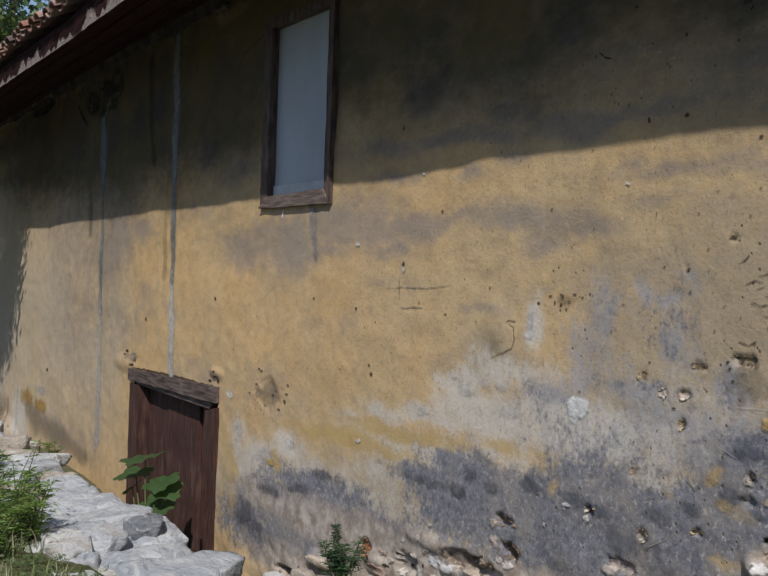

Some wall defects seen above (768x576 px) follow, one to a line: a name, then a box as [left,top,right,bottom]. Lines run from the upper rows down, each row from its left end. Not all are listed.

water stain [168,33,182,377]
water stain [94,96,112,447]
crack [738,273,768,346]
spalling [360,513,520,576]
peeling [559,491,648,576]
spalling [748,553,768,576]